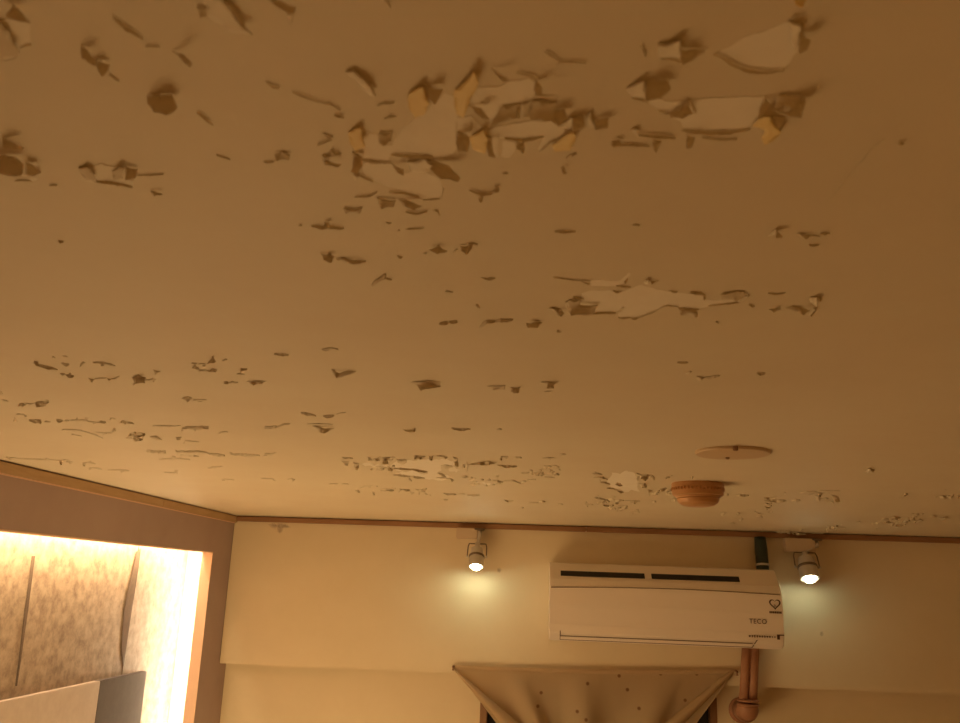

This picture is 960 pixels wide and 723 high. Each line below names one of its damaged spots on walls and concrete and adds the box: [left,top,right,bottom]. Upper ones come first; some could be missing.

peeling [657,0,811,75]
peeling [147,94,177,116]
peeling [611,79,806,153]
peeling [0,138,41,182]
peeling [78,163,164,188]
peeling [316,67,609,216]
peeling [549,272,755,320]
peeling [34,356,120,382]
peeling [132,370,160,385]
peeling [0,391,276,481]
peeling [329,453,566,501]
peeling [585,471,675,514]